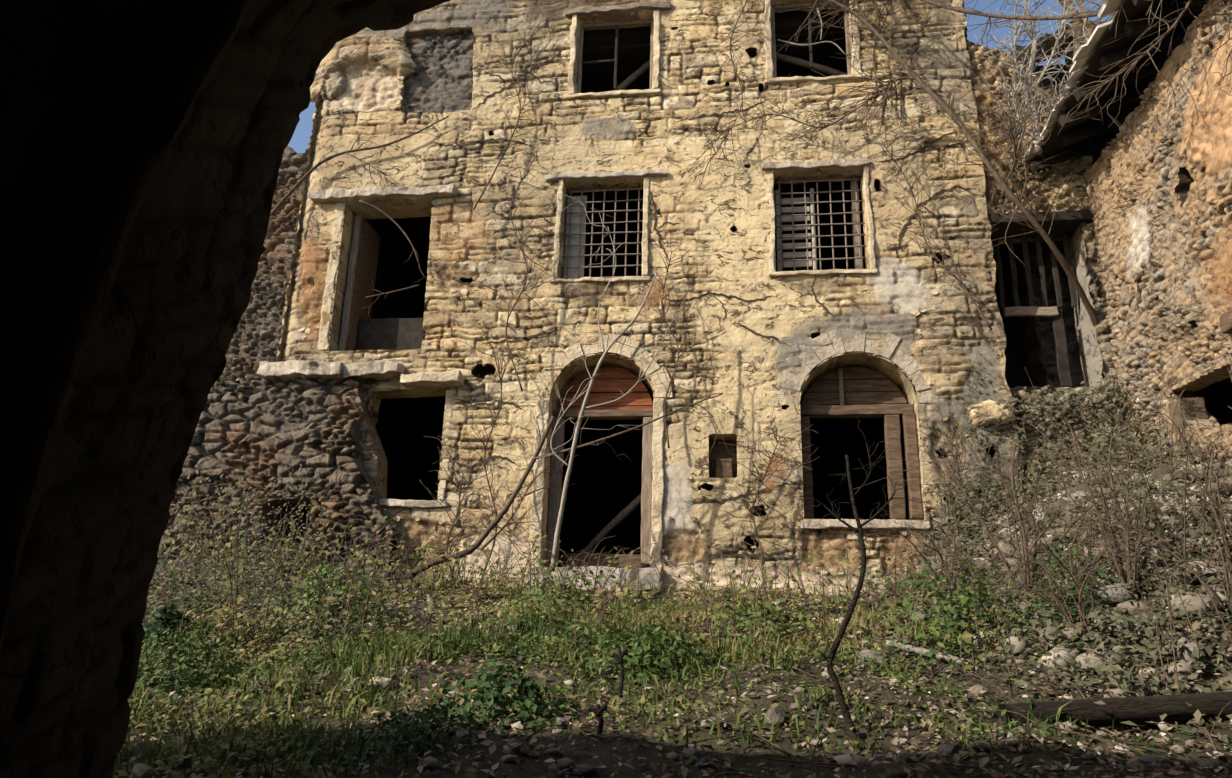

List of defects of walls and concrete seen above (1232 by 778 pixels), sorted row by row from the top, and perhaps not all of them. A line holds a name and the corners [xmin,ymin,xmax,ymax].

flaking render [1181,32,1232,172]
spalling [296,279,324,339]
water stain [776,312,915,369]